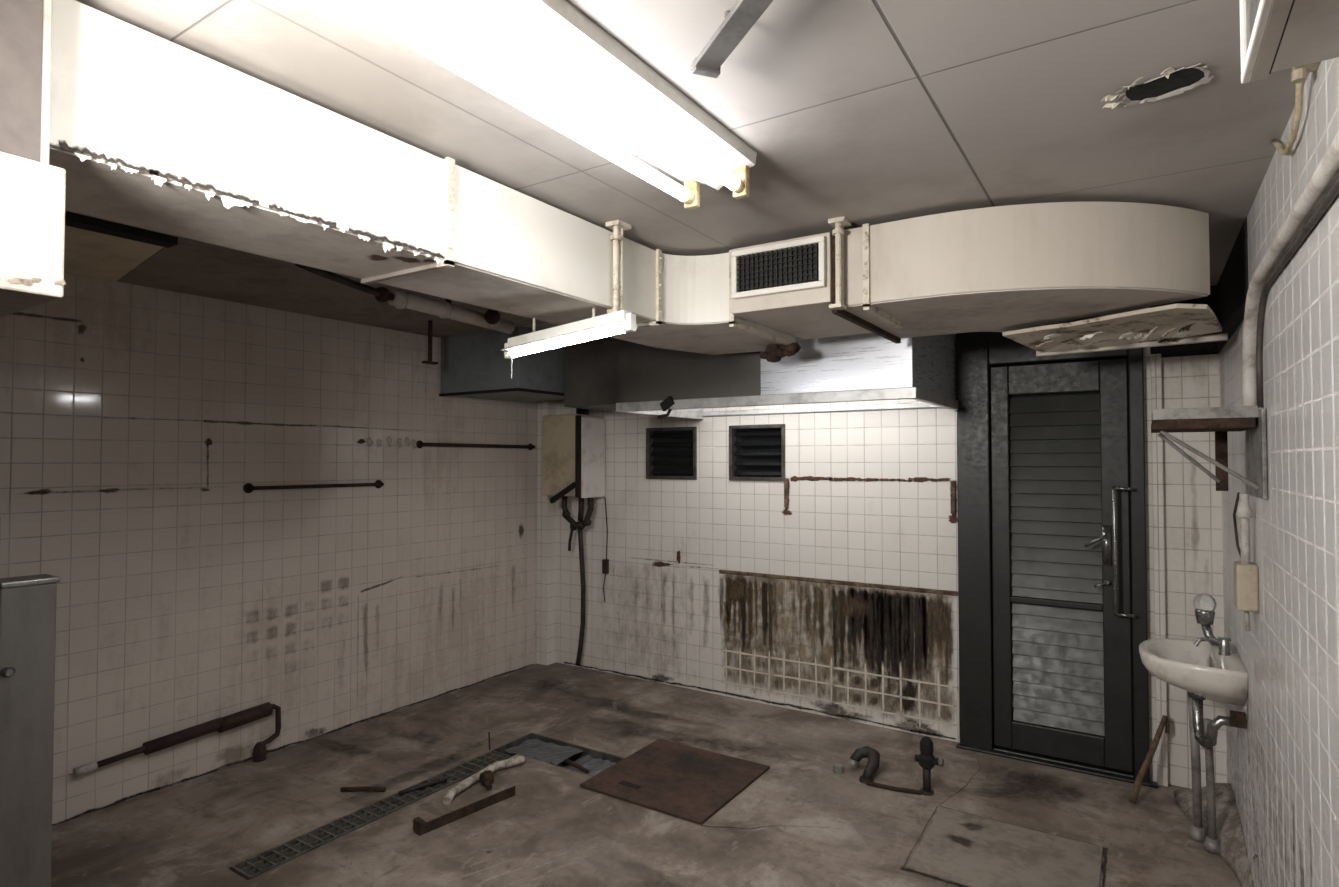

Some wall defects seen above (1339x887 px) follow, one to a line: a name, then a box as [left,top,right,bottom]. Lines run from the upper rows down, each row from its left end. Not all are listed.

peeling [1101,63,1214,109]
peeling [59,140,445,264]
peeling [1002,304,1228,357]
damp [720,578,777,654]
damp [794,586,953,684]